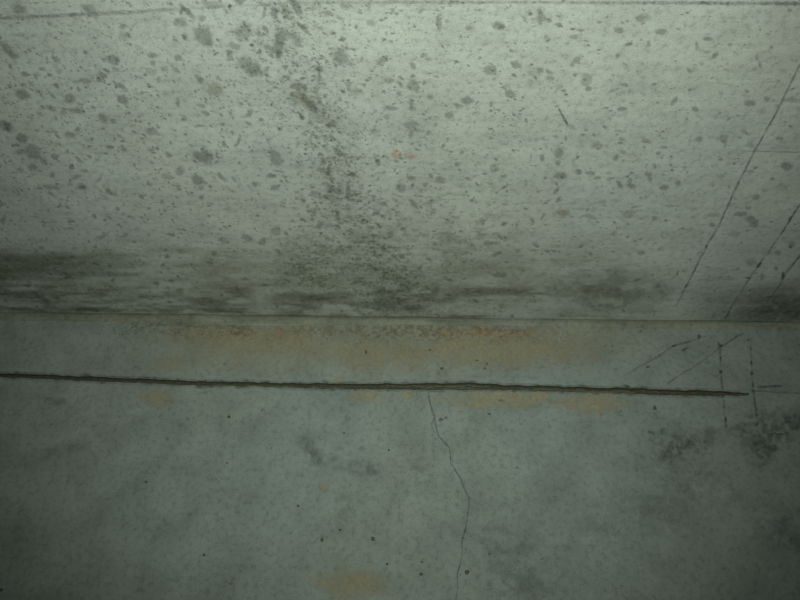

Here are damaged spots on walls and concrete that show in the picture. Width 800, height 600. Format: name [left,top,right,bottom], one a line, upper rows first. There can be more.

crack [0,373,749,396]